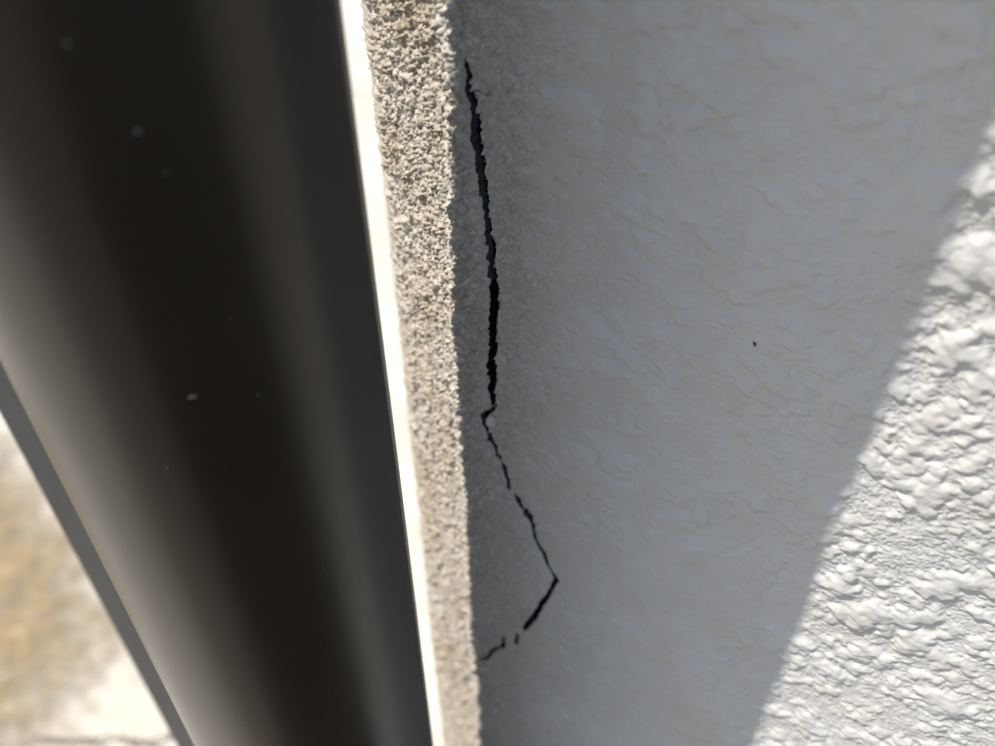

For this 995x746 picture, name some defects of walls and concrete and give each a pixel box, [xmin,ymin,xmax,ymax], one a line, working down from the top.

crack [464,59,559,660]